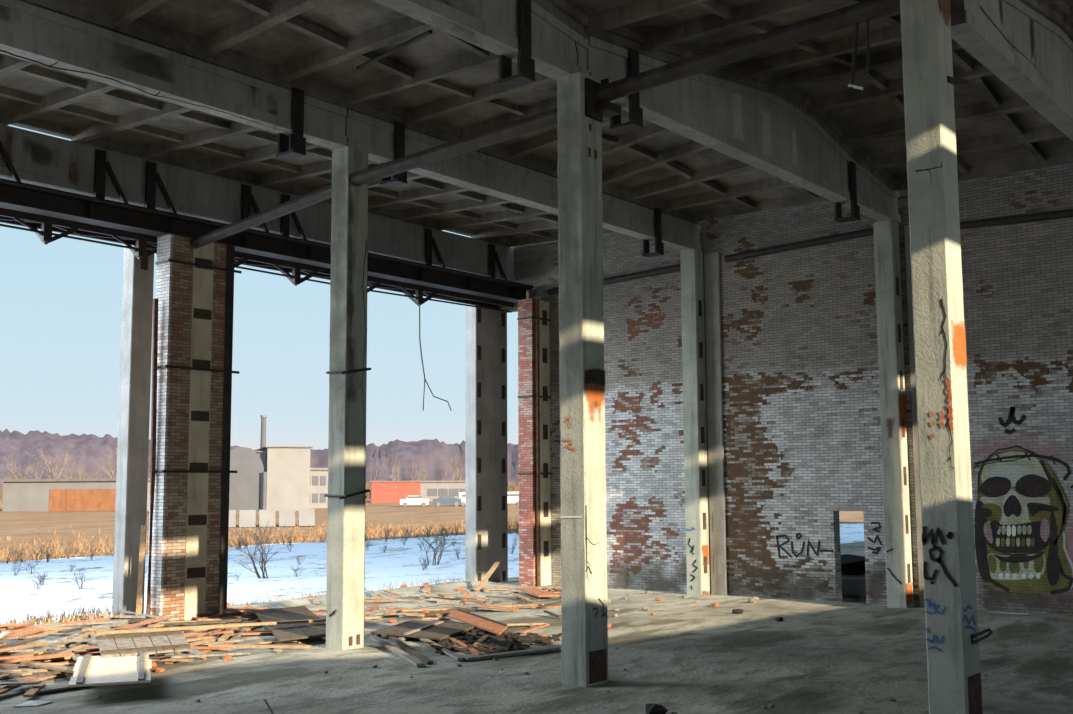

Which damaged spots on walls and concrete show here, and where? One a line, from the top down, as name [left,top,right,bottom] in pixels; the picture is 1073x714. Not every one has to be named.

peeling [626,296,665,348]
rust [584,381,605,419]
peeling [618,359,642,377]
peeling [610,380,683,473]
crack [939,299,953,469]
spalling [974,351,1073,392]
peeling [722,368,874,600]
peeling [609,490,685,577]